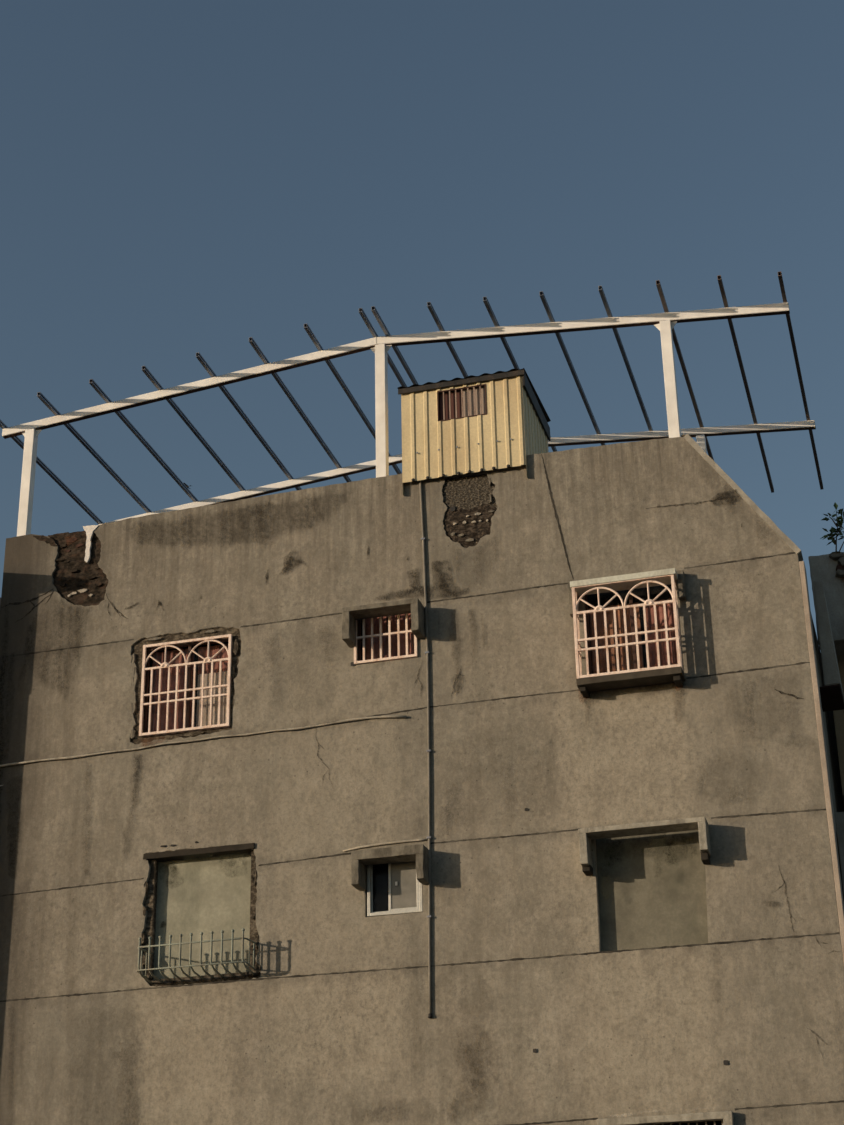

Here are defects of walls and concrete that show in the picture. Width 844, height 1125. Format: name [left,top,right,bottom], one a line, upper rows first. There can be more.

spalling [33,525,108,606]
spalling [442,474,497,548]
spalling [130,627,241,744]
spalling [141,846,262,987]